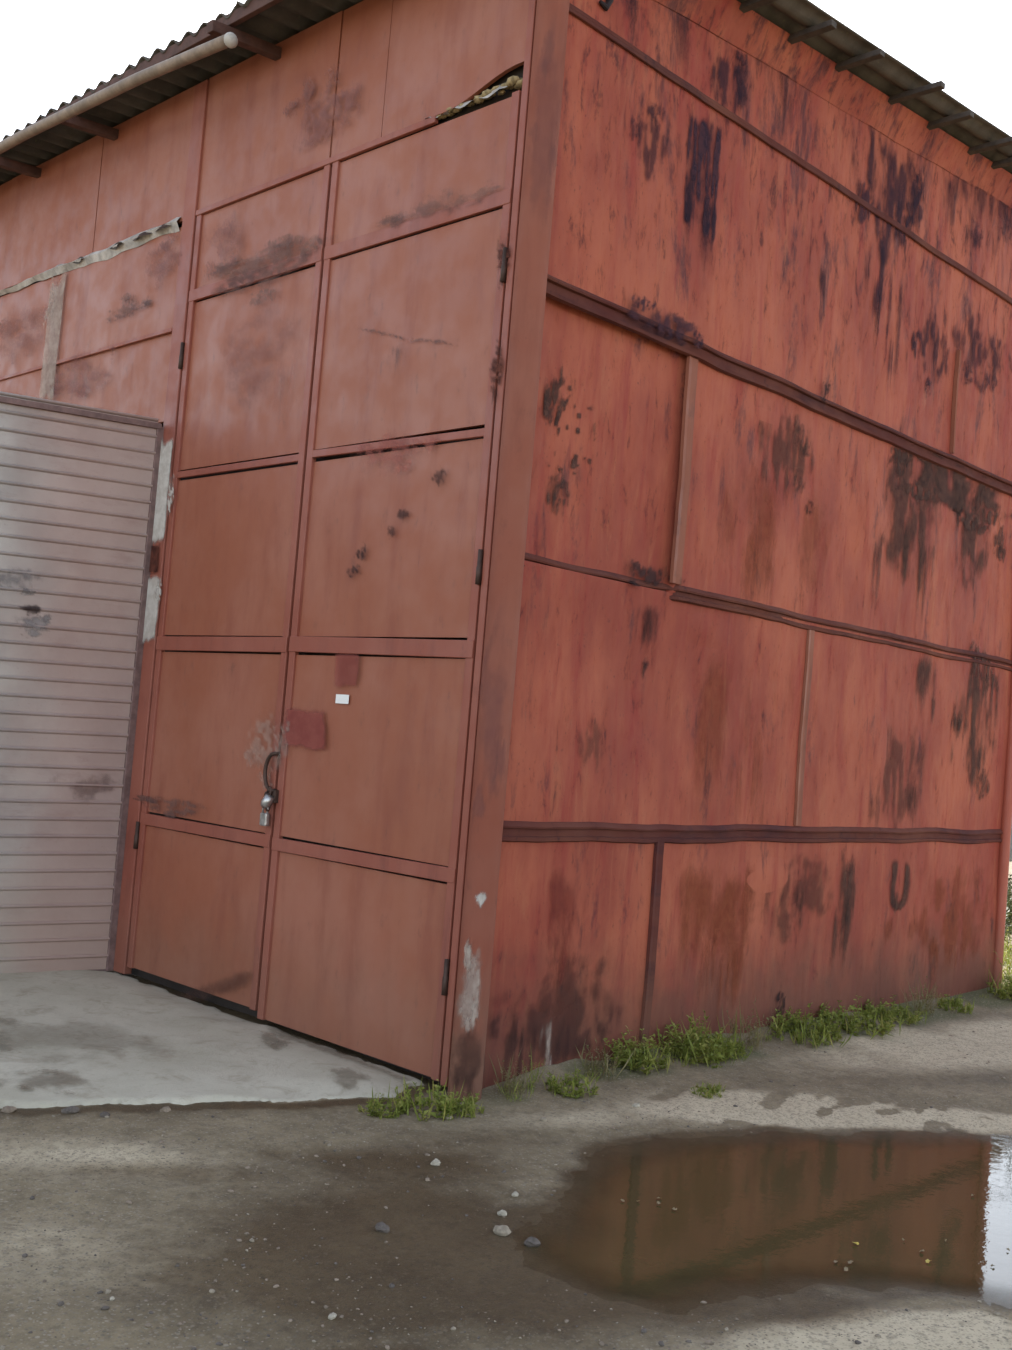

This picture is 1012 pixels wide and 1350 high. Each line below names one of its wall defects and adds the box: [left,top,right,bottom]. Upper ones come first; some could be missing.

spalling [422,65,524,131]
peeling [0,217,180,400]
peeling [152,441,174,542]
peeling [143,577,161,642]
peeling [459,941,480,1030]